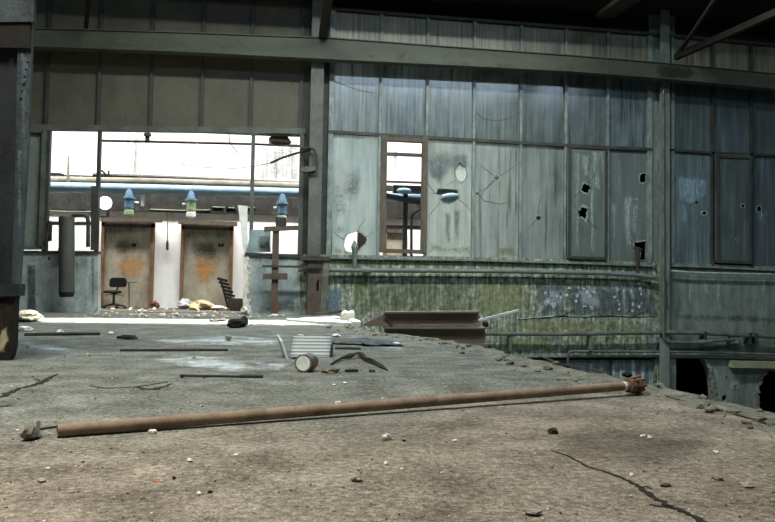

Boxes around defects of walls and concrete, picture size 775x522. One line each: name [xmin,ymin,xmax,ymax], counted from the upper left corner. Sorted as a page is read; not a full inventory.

water stain [539,284,652,314]
water stain [160,337,278,345]
water stain [160,357,283,369]
crack [0,374,58,407]
spalling [665,358,742,413]
crack [551,450,707,522]